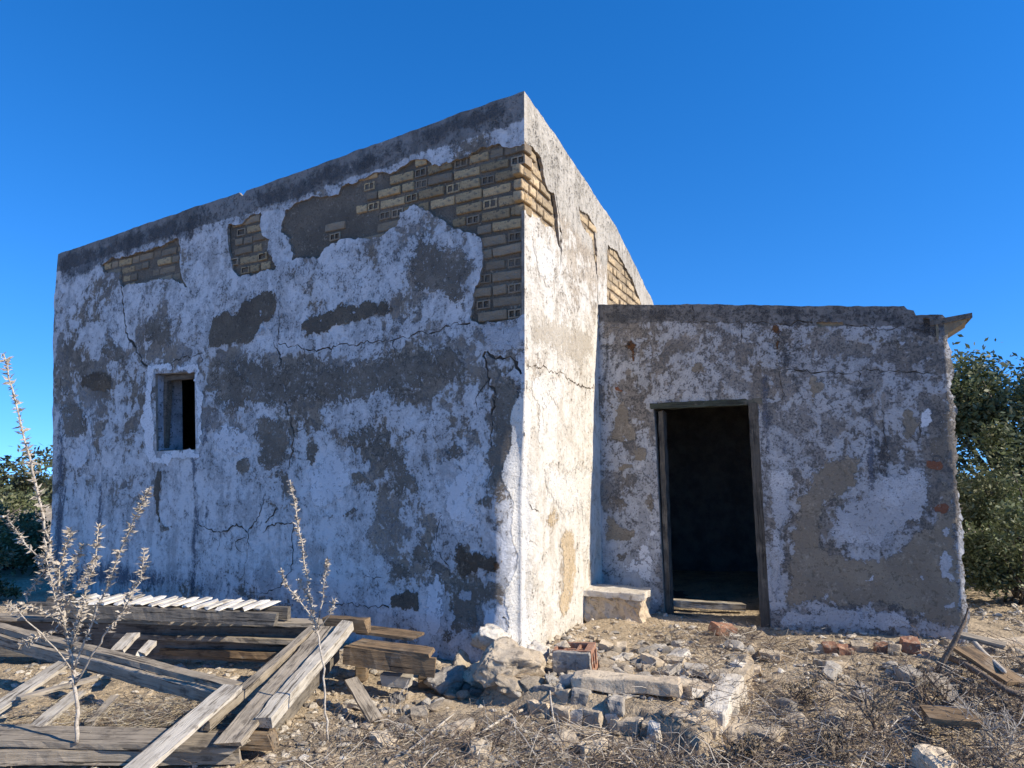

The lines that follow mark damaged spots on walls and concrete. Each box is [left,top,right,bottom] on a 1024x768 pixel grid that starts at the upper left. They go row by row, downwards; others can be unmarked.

spalling [104,239,187,287]
spalling [230,142,593,367]
spalling [580,212,641,305]
crack [265,293,470,457]
crack [475,351,593,478]